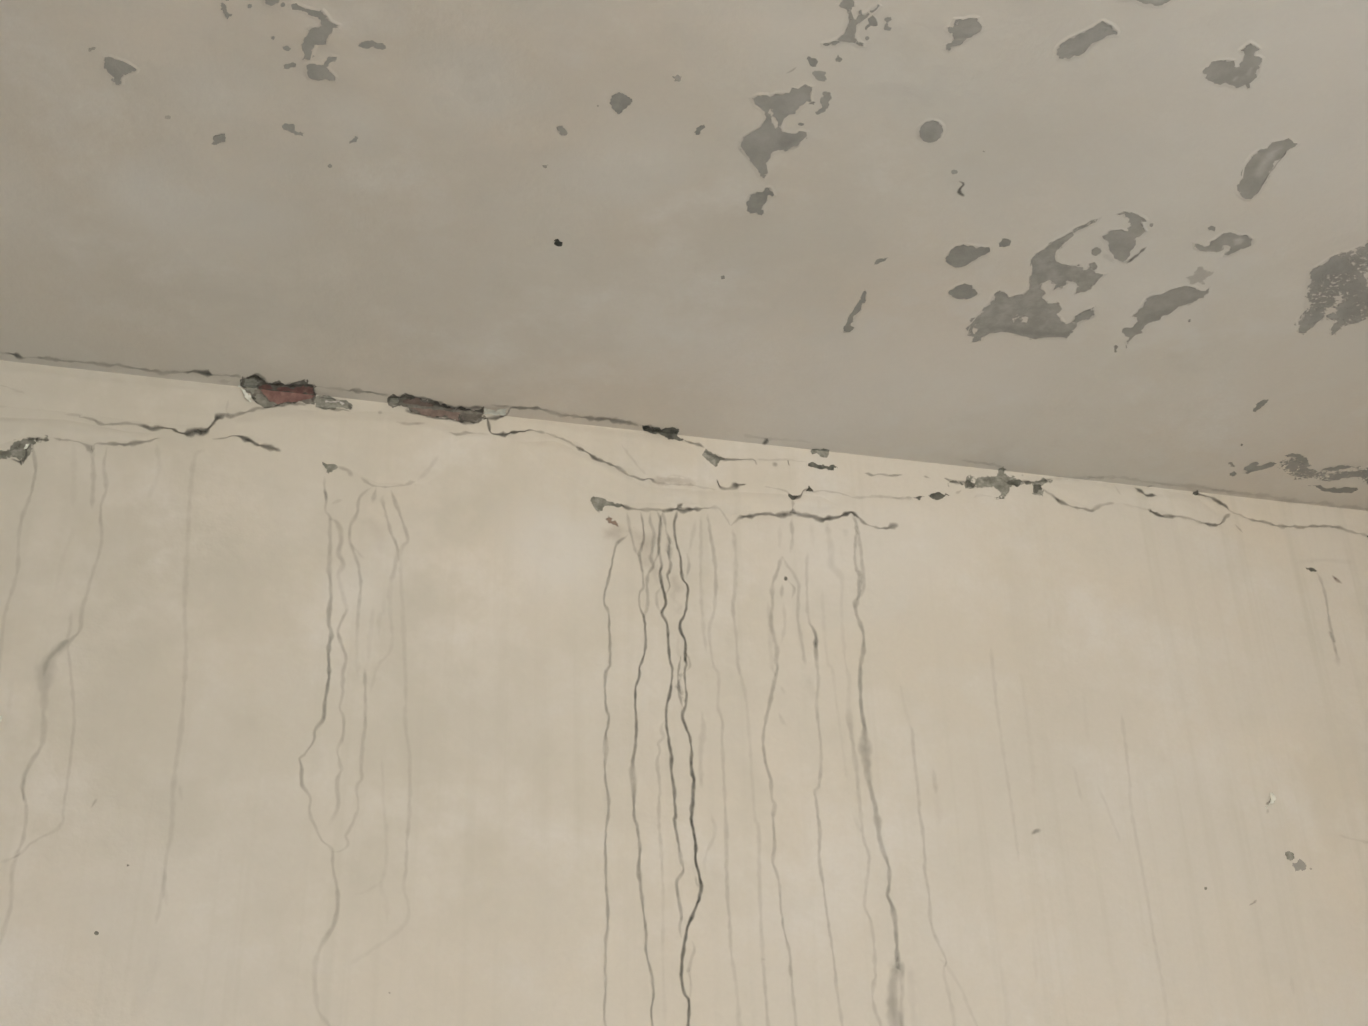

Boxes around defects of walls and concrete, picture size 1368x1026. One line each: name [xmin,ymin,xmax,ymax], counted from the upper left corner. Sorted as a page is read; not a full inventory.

peeling [737,0,892,217]
peeling [1233,135,1301,201]
peeling [942,209,1153,343]
peeling [1119,284,1212,345]
spalling [0,435,49,465]
crack [143,416,274,449]
crack [484,408,528,436]
crack [590,479,645,512]
crack [717,481,857,522]
crack [1139,490,1224,526]
water stain [667,557,689,662]
water stain [674,715,702,1026]